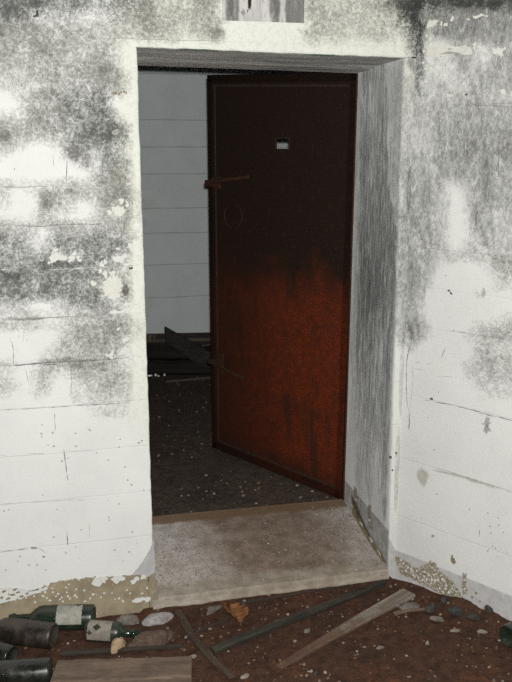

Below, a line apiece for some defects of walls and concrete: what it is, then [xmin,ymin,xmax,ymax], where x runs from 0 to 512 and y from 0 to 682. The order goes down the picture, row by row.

damp [365,0,512,94]
peeling [421,16,476,71]
peeling [482,46,506,58]
damp [0,0,131,388]
damp [434,102,512,245]
damp [355,74,431,426]
peeling [350,486,387,564]
peeling [0,540,158,620]
peeling [395,557,485,610]